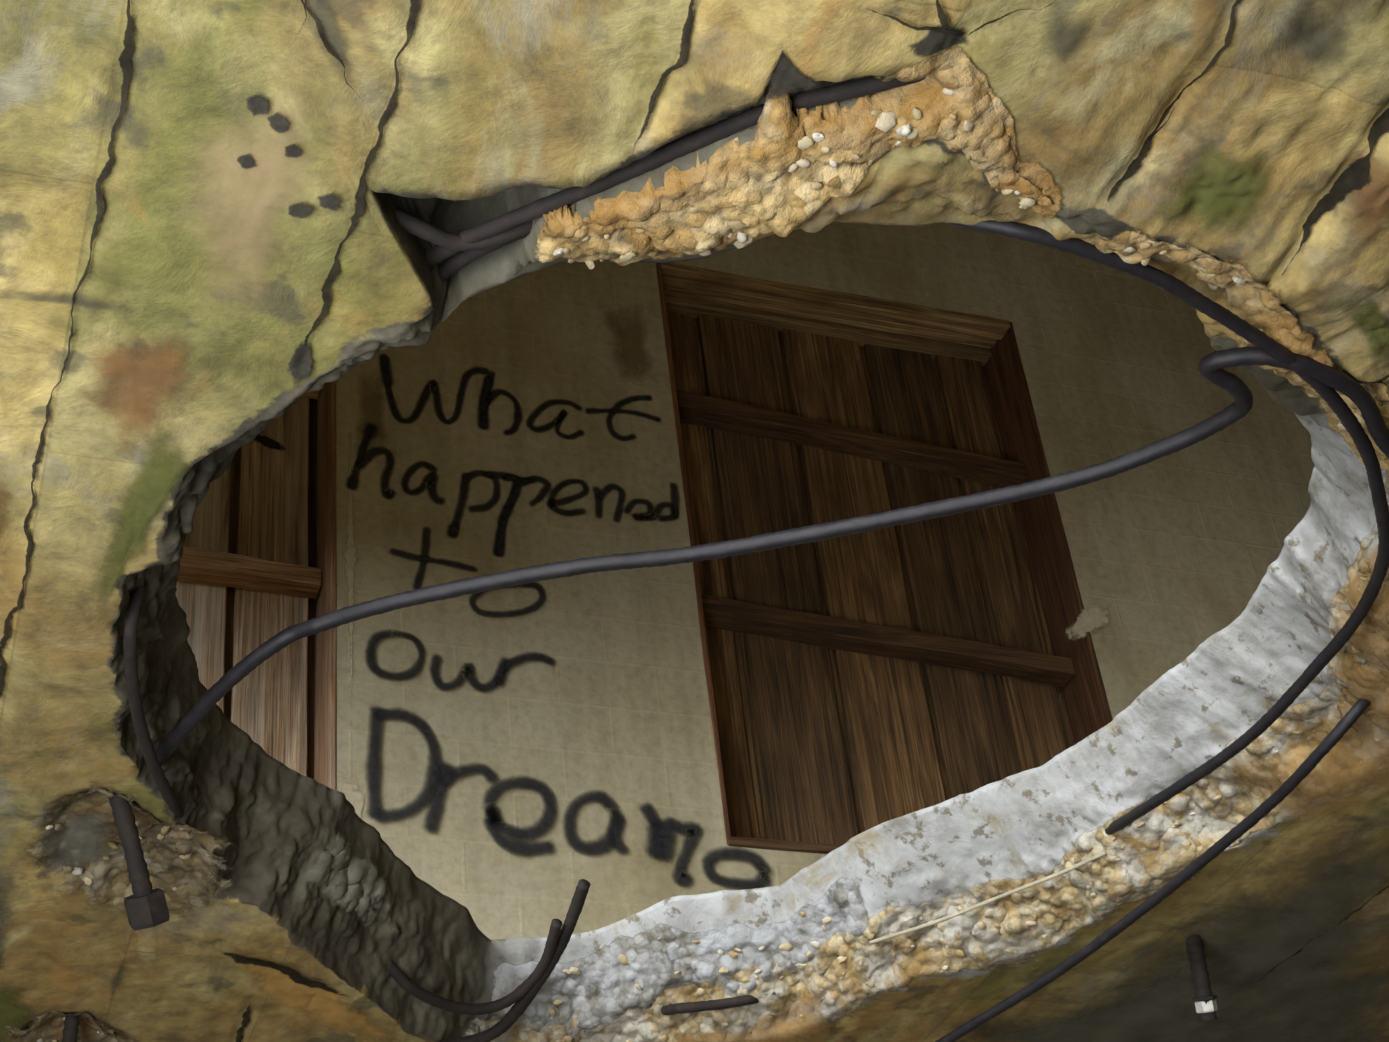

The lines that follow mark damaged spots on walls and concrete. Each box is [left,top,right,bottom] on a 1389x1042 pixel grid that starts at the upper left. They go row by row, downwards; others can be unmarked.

spalling [237,154,256,169]
spalling [247,95,302,158]
spalling [289,193,341,218]
crack [297,0,419,341]
crack [634,0,695,146]
spalling [395,26,1062,282]
crack [1107,0,1241,201]
crack [1282,108,1389,275]
crack [0,0,135,697]
spalling [25,220,1389,1042]
spalling [4,1010,135,1042]